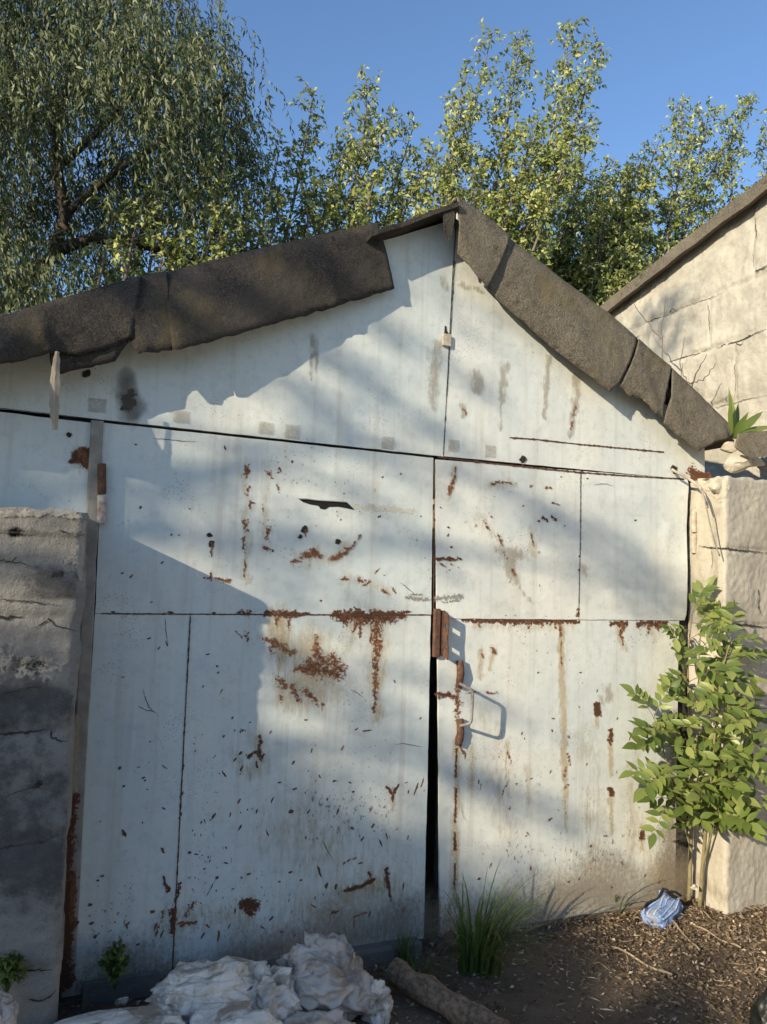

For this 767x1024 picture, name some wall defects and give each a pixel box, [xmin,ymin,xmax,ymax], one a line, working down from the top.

crack [645,294,767,407]
crack [0,599,75,631]
rust [63,347,712,970]
rust [59,793,83,992]